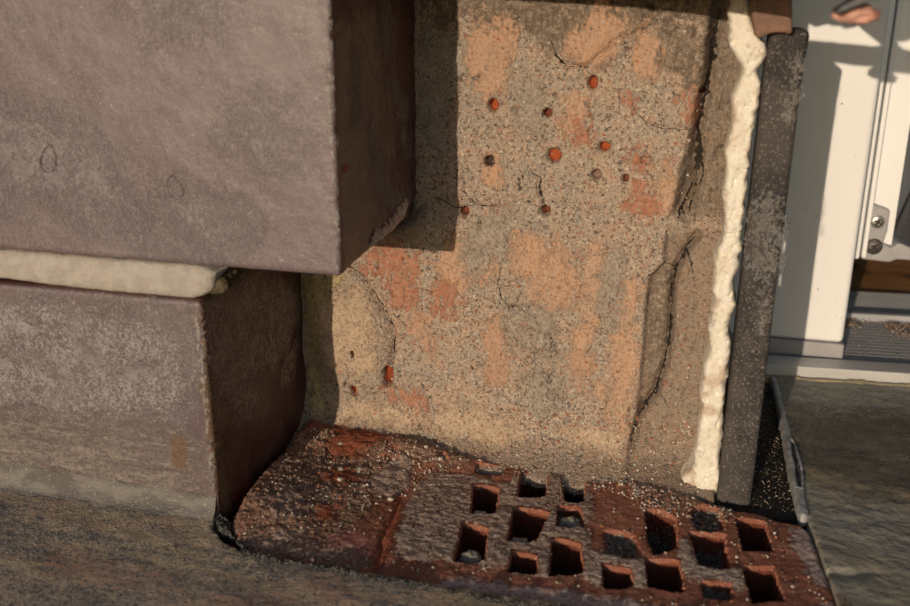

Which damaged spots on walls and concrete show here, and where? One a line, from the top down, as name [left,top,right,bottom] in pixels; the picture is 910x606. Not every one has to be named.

crack [550,3,657,68]
crack [432,189,500,208]
crack [632,12,719,438]
crack [349,266,396,375]
water stain [773,375,910,507]
peeling [255,481,348,526]
peeling [318,454,414,497]